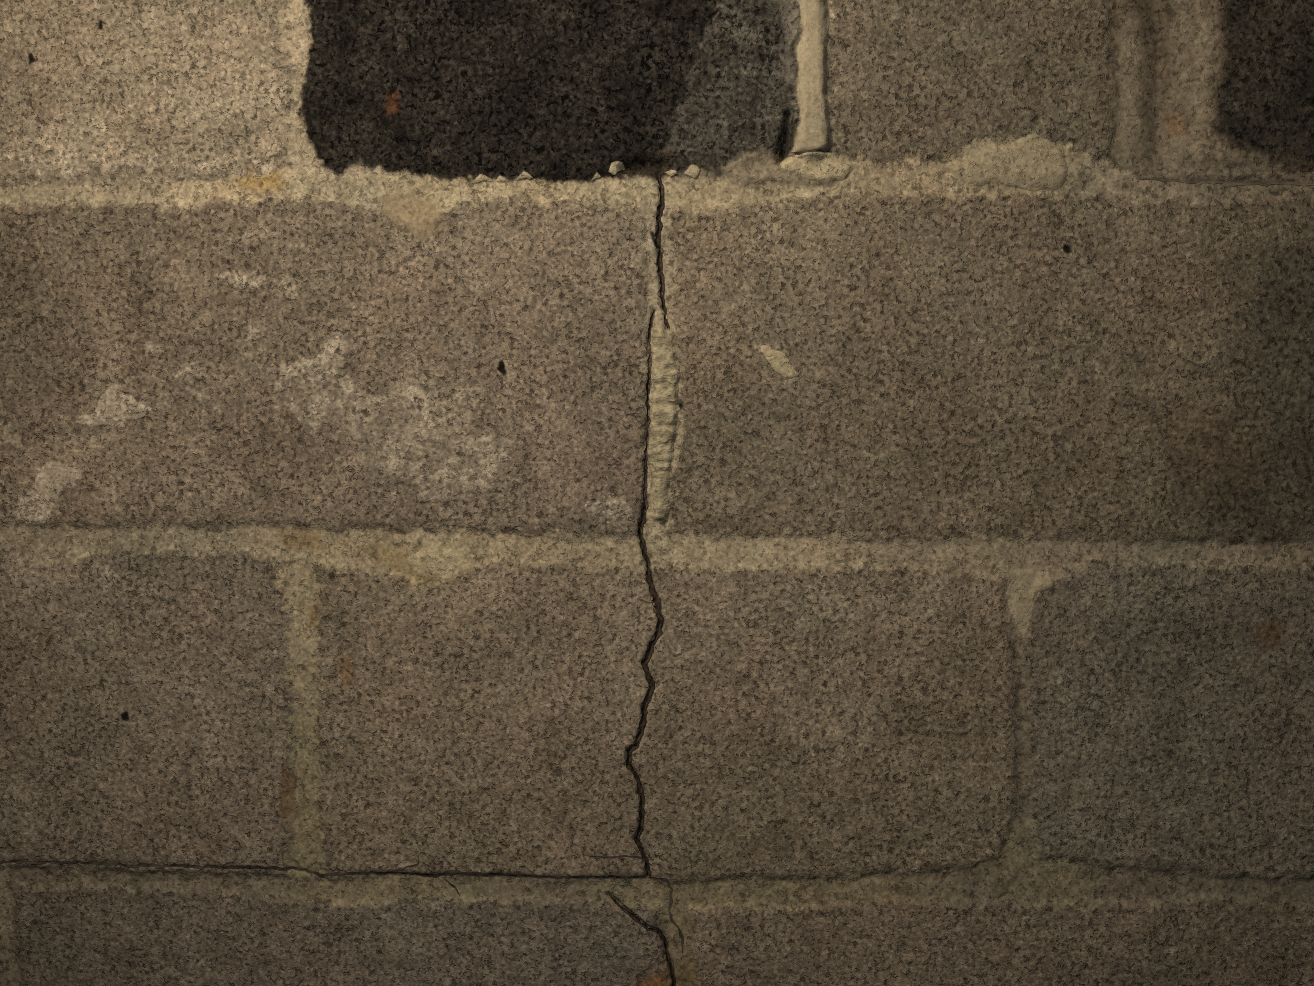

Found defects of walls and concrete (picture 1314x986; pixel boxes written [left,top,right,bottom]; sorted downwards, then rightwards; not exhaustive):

water stain [298,0,797,182]
crack [0,174,684,986]